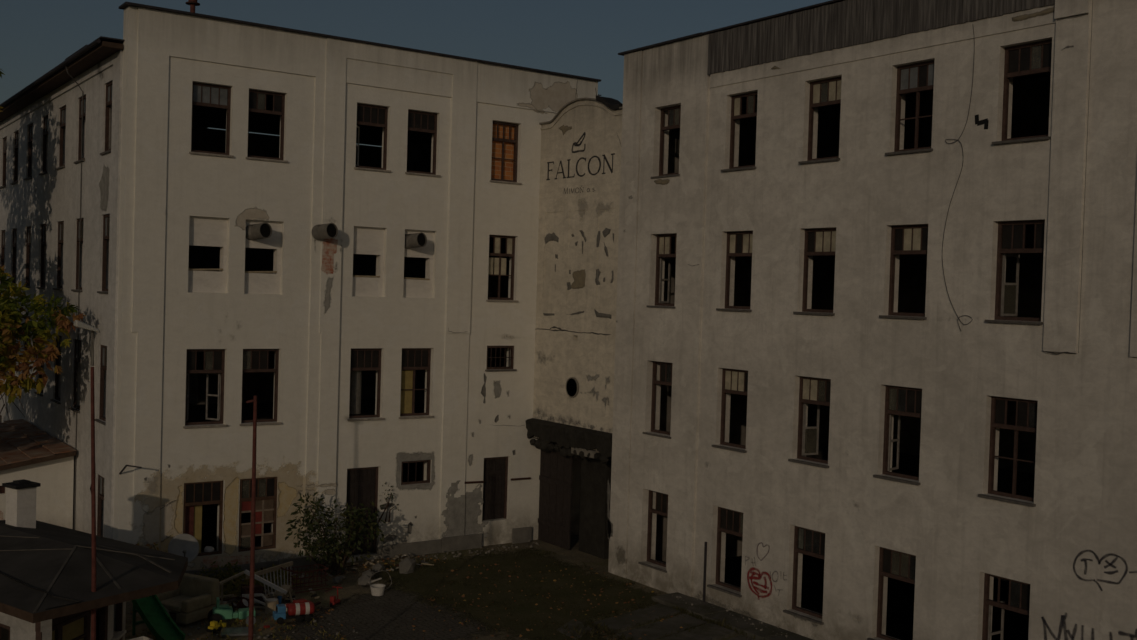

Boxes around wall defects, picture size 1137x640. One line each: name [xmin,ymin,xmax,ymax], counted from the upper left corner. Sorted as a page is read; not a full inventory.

flaking render [321,238,338,275]
peeling [545,228,625,290]
peeling [174,486,183,533]
peeling [223,477,239,554]
peeling [277,482,297,517]
spalling [442,480,488,538]